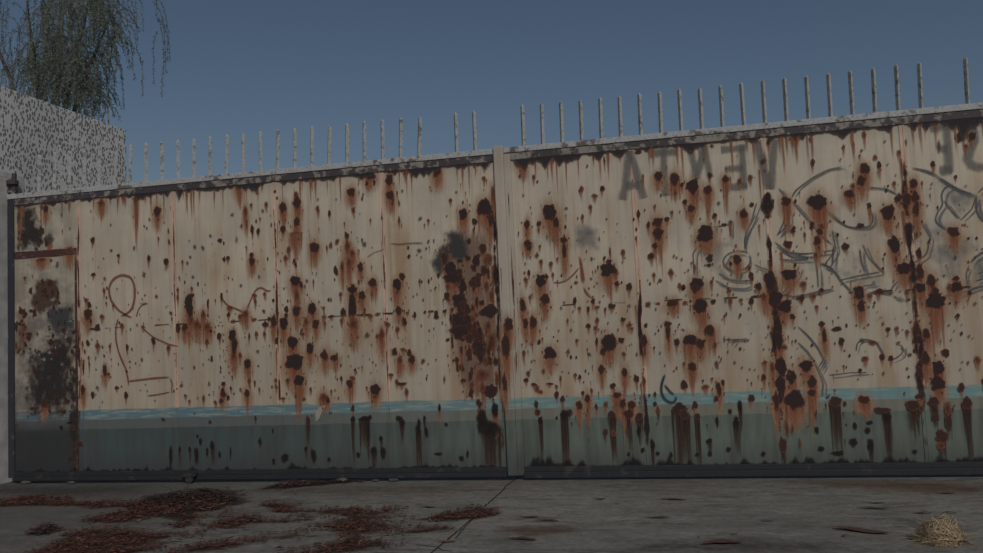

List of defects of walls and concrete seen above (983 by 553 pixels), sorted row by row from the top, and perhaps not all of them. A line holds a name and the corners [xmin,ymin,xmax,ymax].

rust [15,117,983,480]
crack [415,476,519,553]